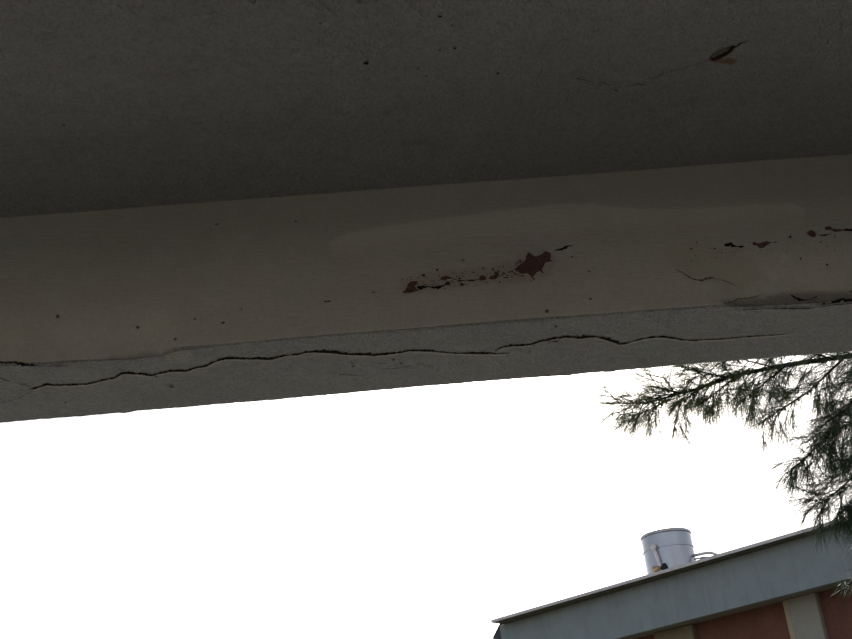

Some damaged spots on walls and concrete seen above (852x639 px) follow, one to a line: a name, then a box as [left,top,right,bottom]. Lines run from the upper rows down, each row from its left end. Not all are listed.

crack [676,269,736,286]
crack [0,333,795,403]